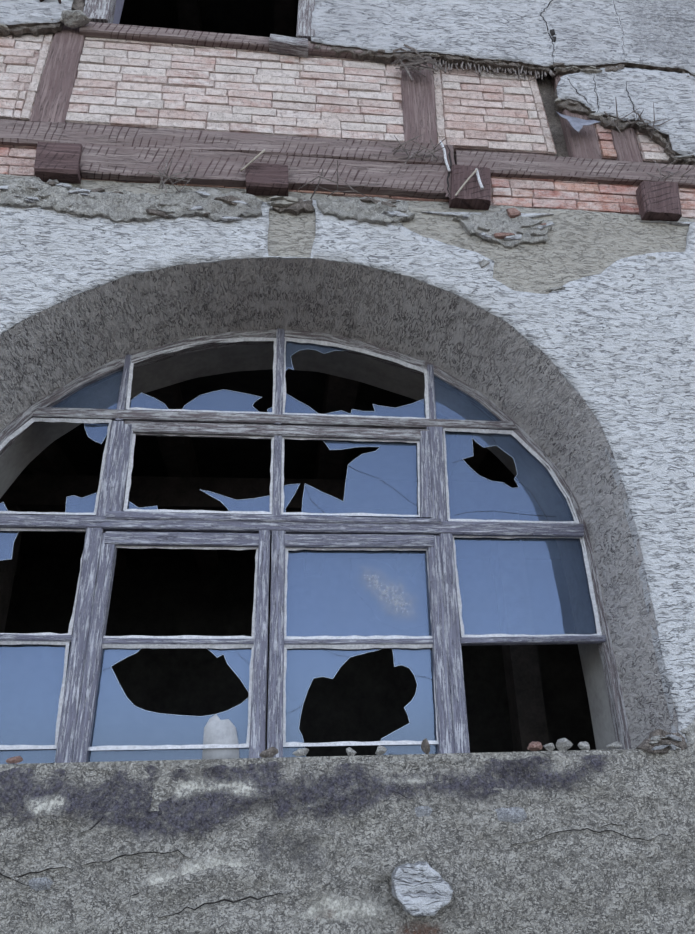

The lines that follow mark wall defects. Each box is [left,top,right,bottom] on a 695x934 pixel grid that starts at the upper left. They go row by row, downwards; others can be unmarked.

crack [538,0,601,114]
peeling [550,63,602,73]
flaking render [0,177,695,294]
water stain [0,755,606,835]
crack [0,814,192,889]
crack [511,820,675,847]
crack [158,889,288,920]